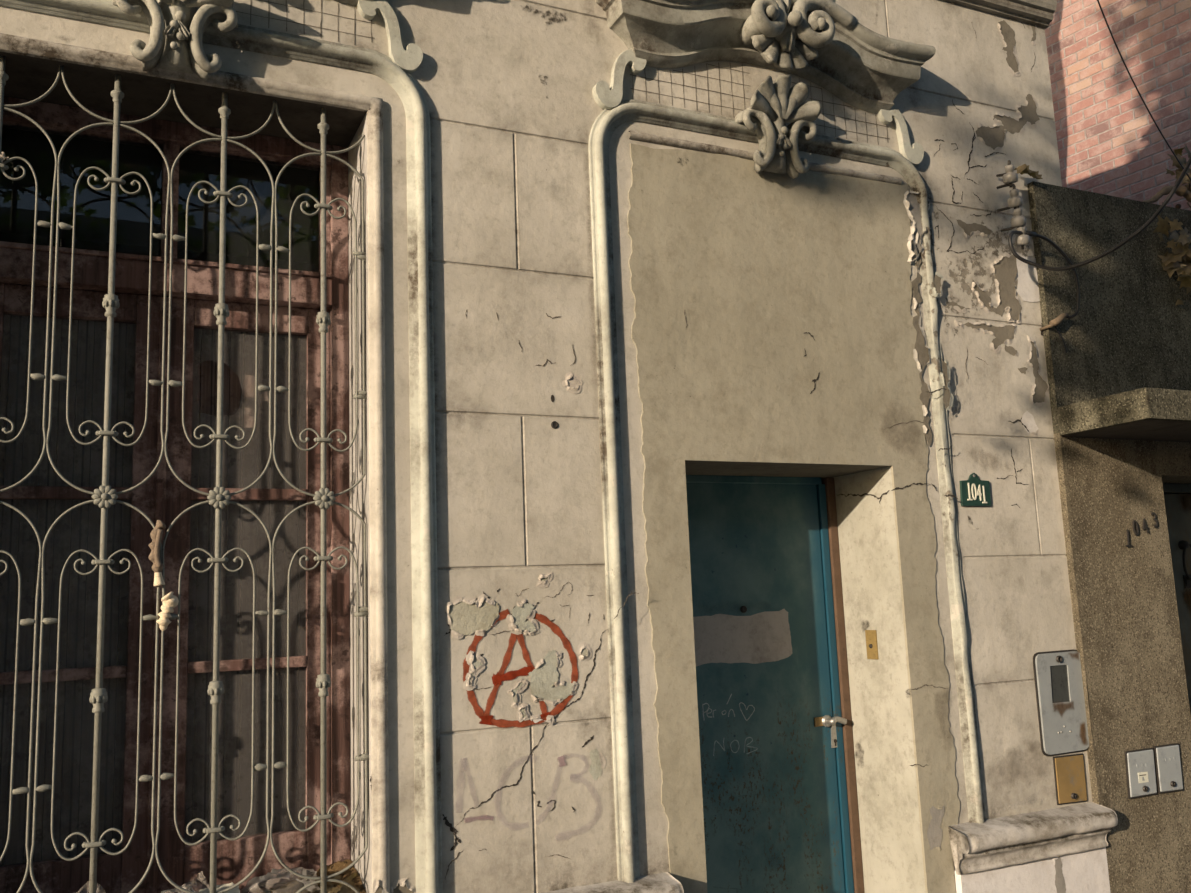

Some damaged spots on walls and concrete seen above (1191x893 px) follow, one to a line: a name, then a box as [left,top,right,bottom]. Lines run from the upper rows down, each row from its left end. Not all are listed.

peeling [997,20,1021,77]
peeling [976,94,1040,152]
crack [924,100,1006,254]
peeling [903,191,1049,446]
crack [997,418,1029,508]
crack [837,483,958,503]
peeling [445,594,538,640]
peeling [463,650,486,691]
peeling [507,650,578,725]
crack [442,582,639,878]
peeling [372,878,416,893]